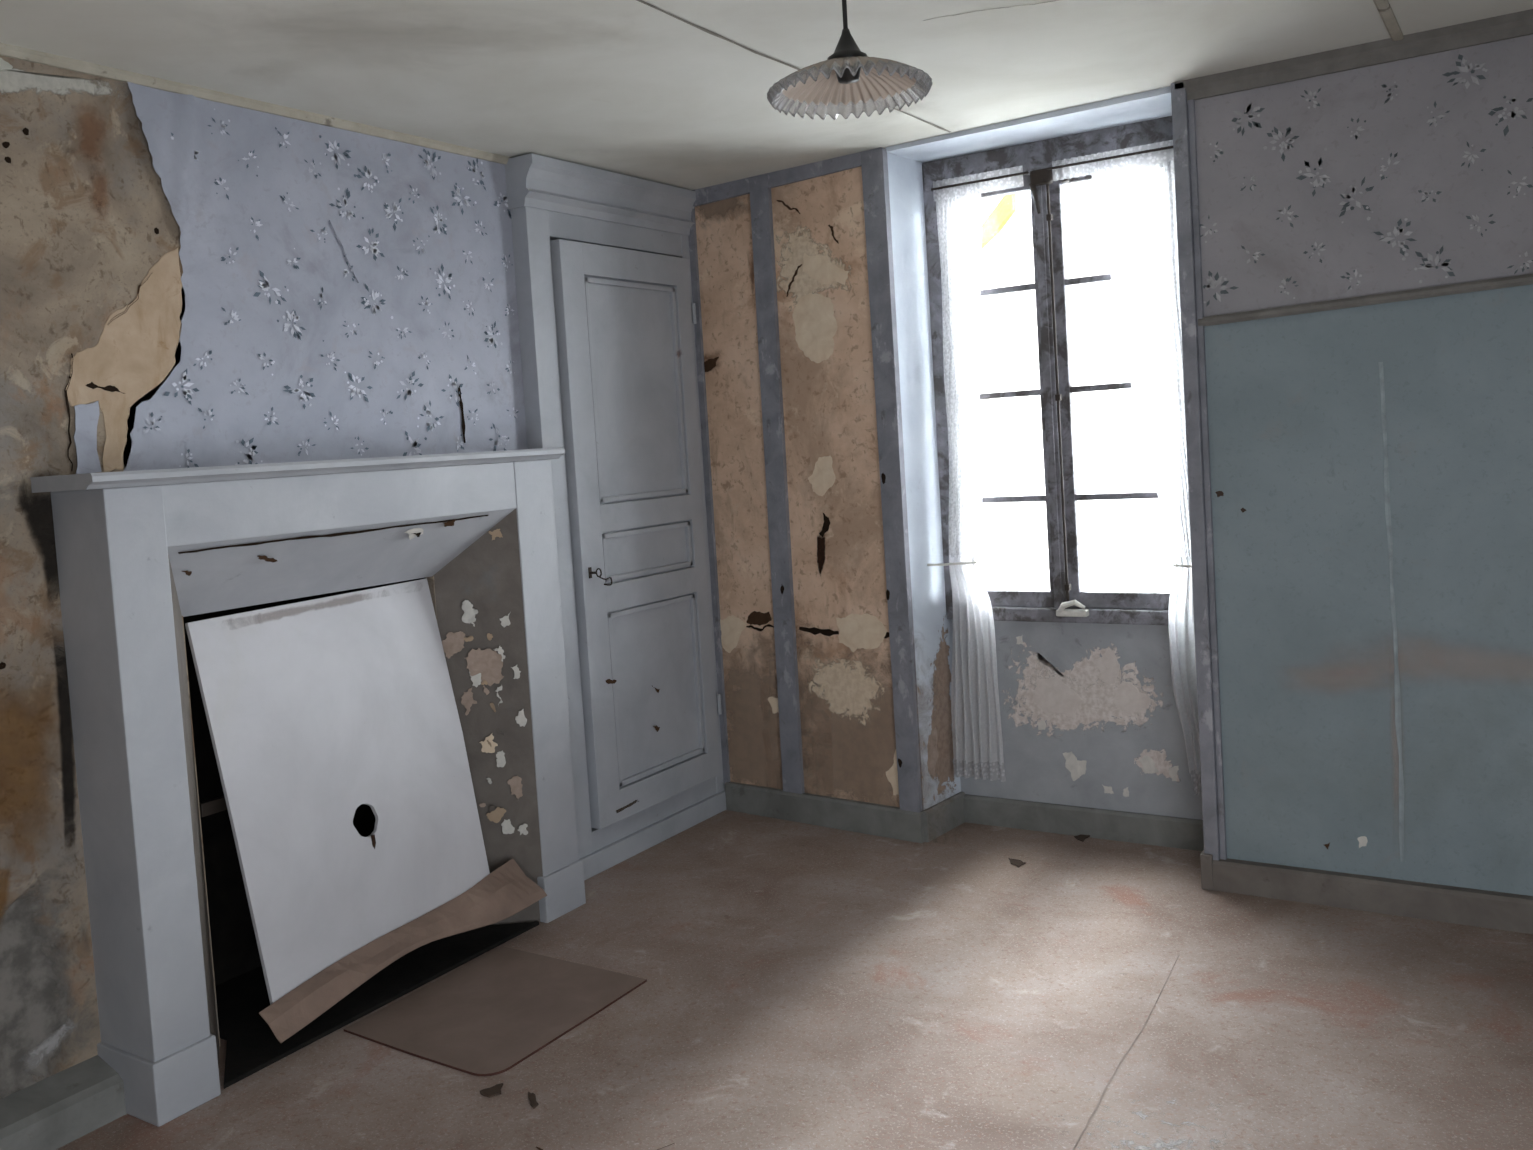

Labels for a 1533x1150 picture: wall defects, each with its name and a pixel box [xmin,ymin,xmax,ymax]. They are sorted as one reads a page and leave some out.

spalling [704,357,719,372]
peeling [777,226,851,363]
peeling [808,456,836,496]
damp [0,646,75,836]
peeling [442,600,528,835]
peeling [1003,635,1169,781]
peeling [1134,748,1179,782]
damp [0,878,90,1099]